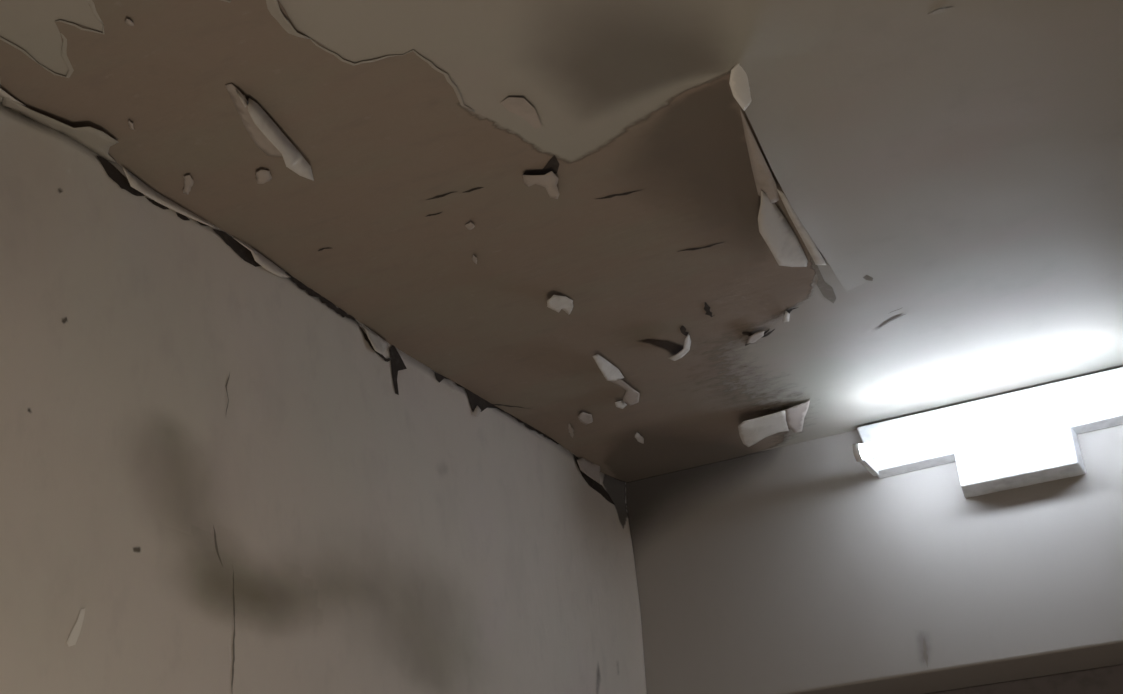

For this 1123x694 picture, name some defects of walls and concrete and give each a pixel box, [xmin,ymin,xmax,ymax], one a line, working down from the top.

peeling [0,0,816,504]